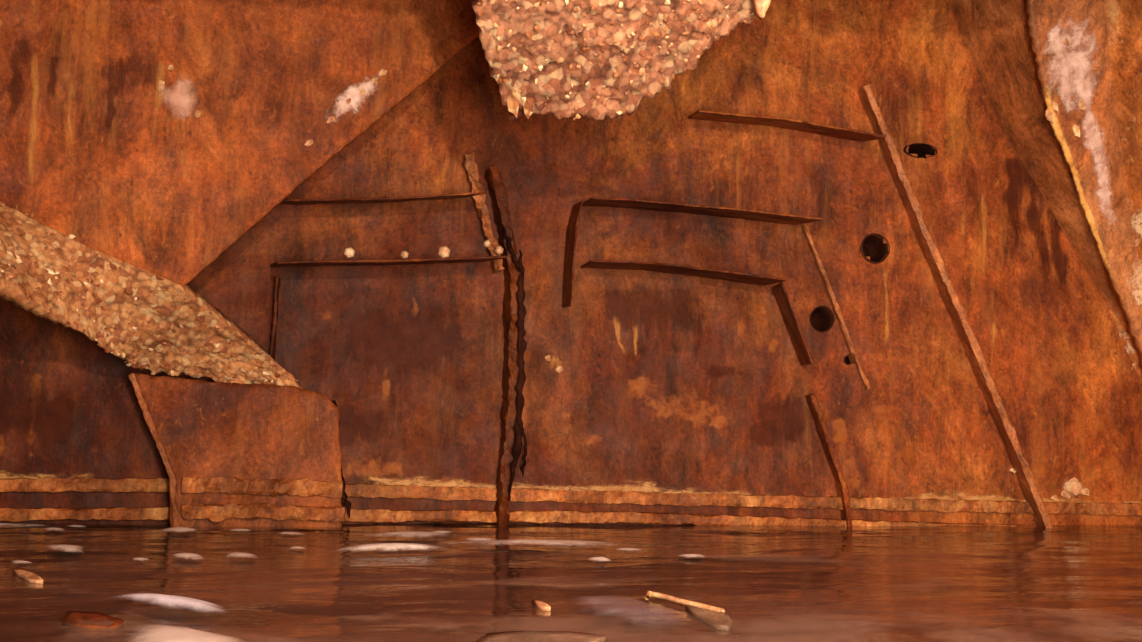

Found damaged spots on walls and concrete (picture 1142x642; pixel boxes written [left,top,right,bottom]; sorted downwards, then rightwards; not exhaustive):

water stain [9,41,29,115]
water stain [48,57,57,93]
water stain [103,59,150,127]
rust [29,59,38,170]
peeling [1127,212,1142,305]
crack [503,225,527,501]
rust [614,318,637,353]
peeling [1119,331,1139,370]
water stain [370,477,496,489]
water stain [511,482,746,495]
water stain [910,492,1026,502]
rust [1050,477,1090,501]